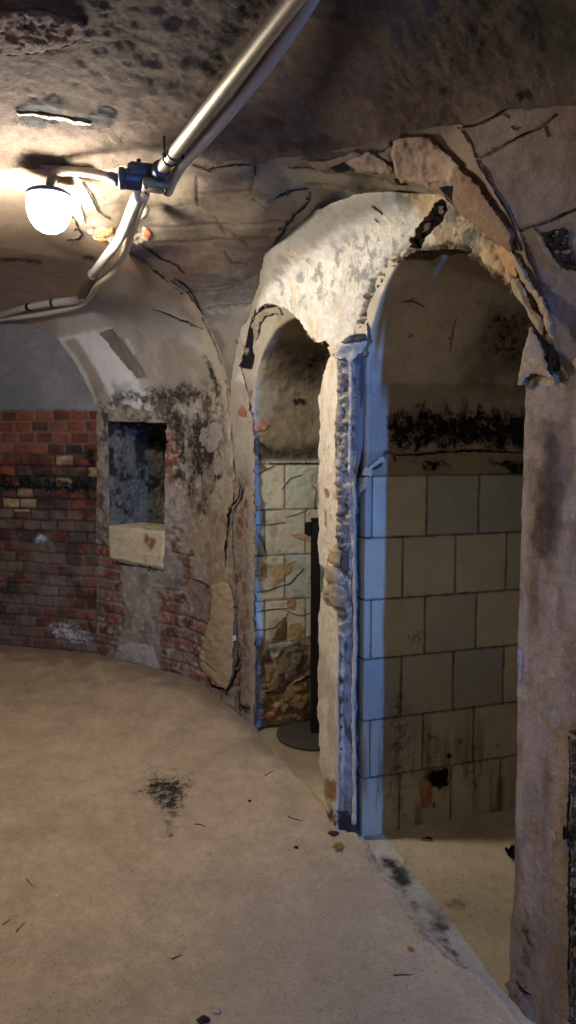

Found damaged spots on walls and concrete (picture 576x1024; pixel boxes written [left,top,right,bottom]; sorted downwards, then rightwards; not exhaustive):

crack [131,245,204,329]
crack [192,162,257,175]
crack [239,305,283,368]
crack [271,186,311,248]
crack [401,297,425,308]
peeling [288,133,561,385]
crack [414,204,448,257]
crack [457,108,576,251]
damp [113,363,222,522]
crack [192,462,318,594]
efflorescence [49,620,93,644]
crack [207,567,311,713]